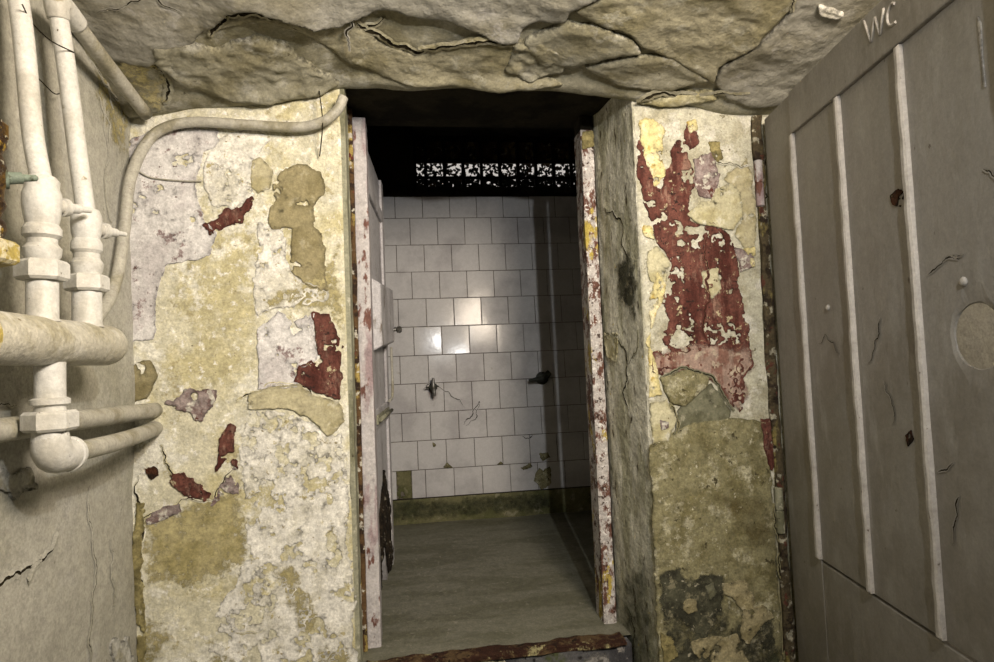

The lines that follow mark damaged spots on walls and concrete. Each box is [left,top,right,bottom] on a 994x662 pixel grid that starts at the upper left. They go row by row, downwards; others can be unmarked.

crack [95,0,184,16]
crack [208,13,306,37]
crack [330,17,516,56]
flaking render [72,0,881,108]
crack [148,65,174,105]
peeling [582,130,594,149]
peeling [890,189,904,207]
peeling [109,127,358,662]
flaking render [636,118,782,662]
peeling [396,470,412,499]
spalling [521,452,551,489]
crack [0,532,59,591]